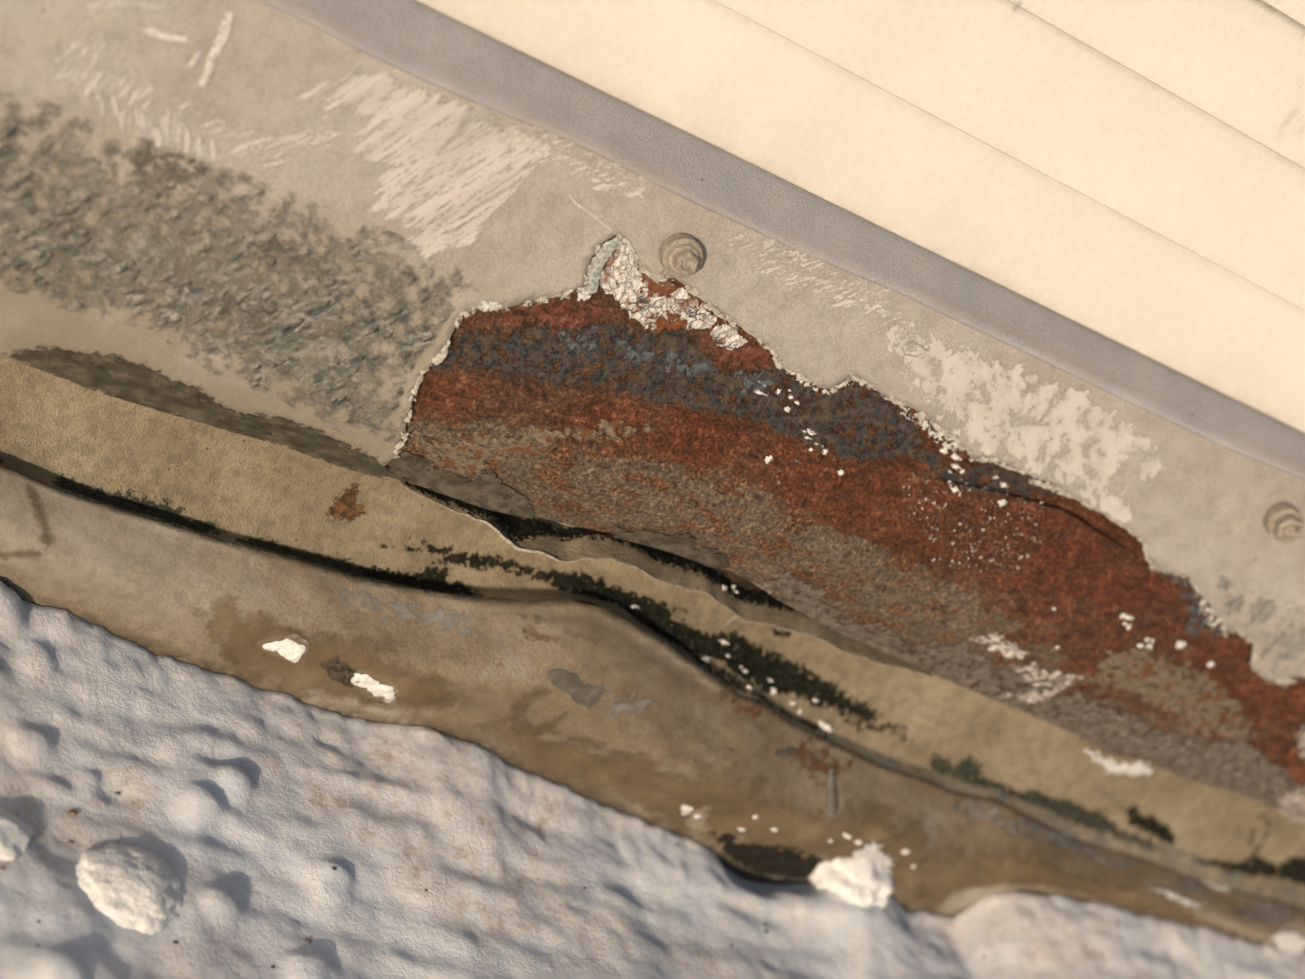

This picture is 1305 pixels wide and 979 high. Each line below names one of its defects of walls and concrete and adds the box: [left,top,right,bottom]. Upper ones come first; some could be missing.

peeling [585,237,747,350]
corrosion [325,483,366,523]
leakage [3,346,828,628]
leakage [50,474,914,742]
peeling [547,669,652,718]
corrosion [385,234,1305,821]
leakage [505,690,1239,936]
leakage [1197,853,1305,886]